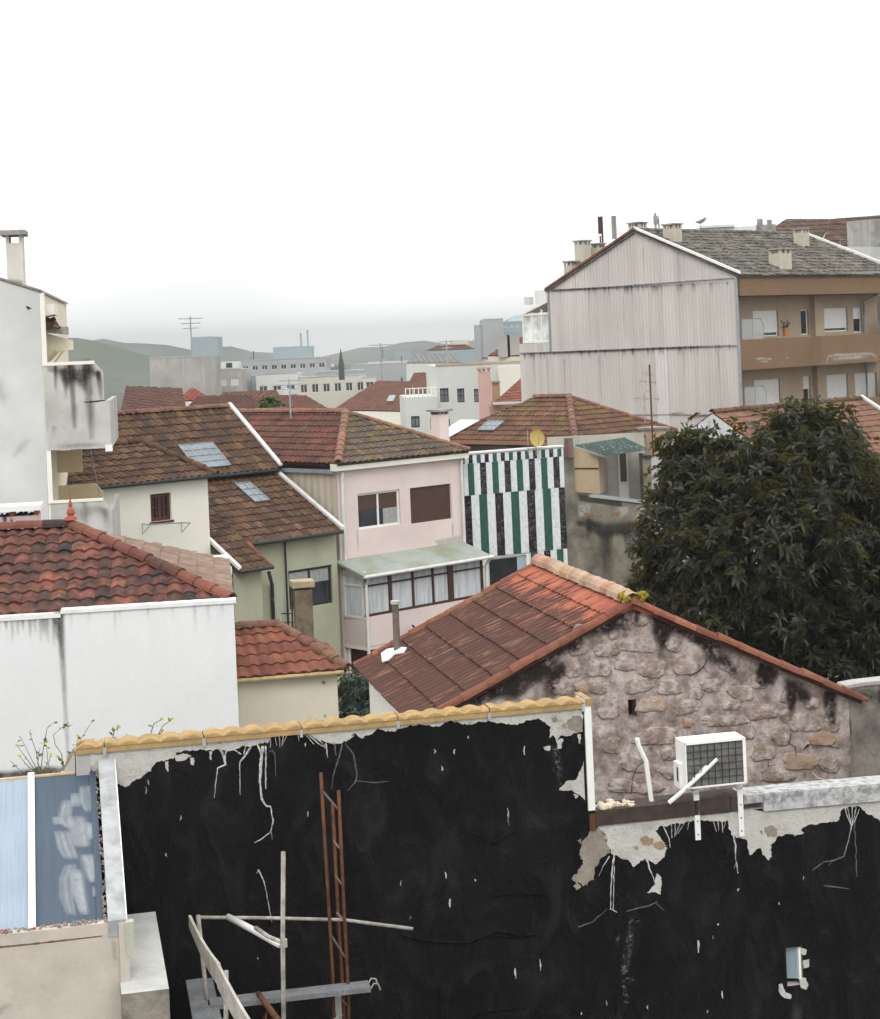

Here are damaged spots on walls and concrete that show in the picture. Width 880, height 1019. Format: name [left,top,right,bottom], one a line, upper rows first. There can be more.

damp [55,364,100,388]
damp [757,664,811,712]
damp [823,691,837,722]
peeling [304,709,583,751]
peeling [90,737,270,792]
peeling [559,763,585,800]
peeling [572,801,880,894]
crack [813,823,857,889]
crack [578,902,664,928]
peeling [799,947,809,990]